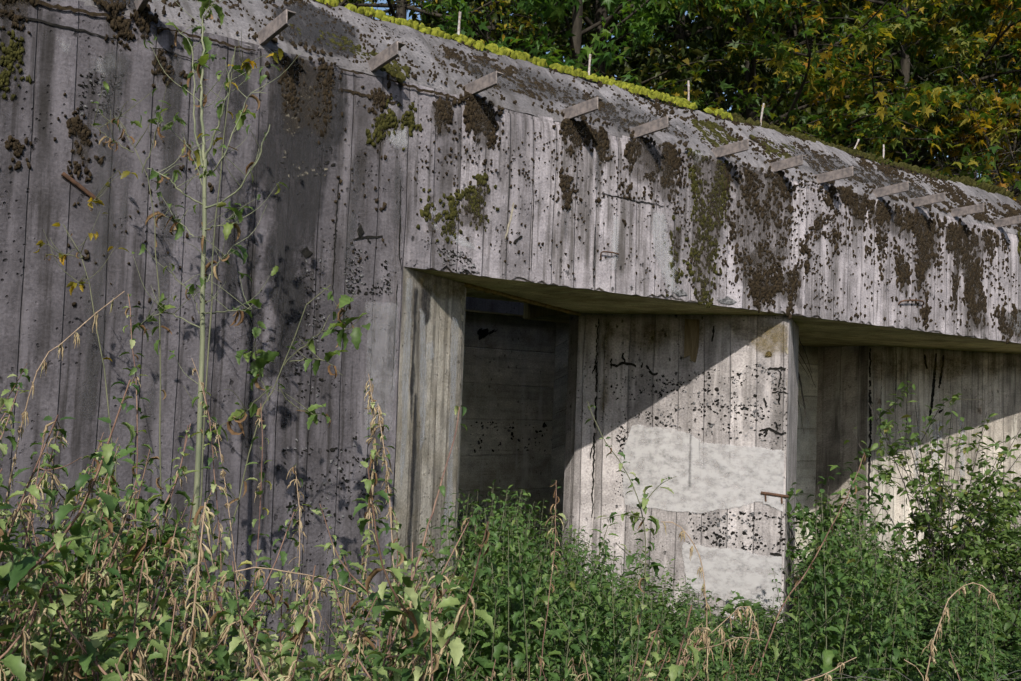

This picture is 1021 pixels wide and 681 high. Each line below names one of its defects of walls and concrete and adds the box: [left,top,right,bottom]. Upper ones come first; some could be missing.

damp [273,3,358,57]
damp [229,56,249,138]
damp [222,179,245,314]
damp [253,50,347,416]
damp [239,385,260,453]